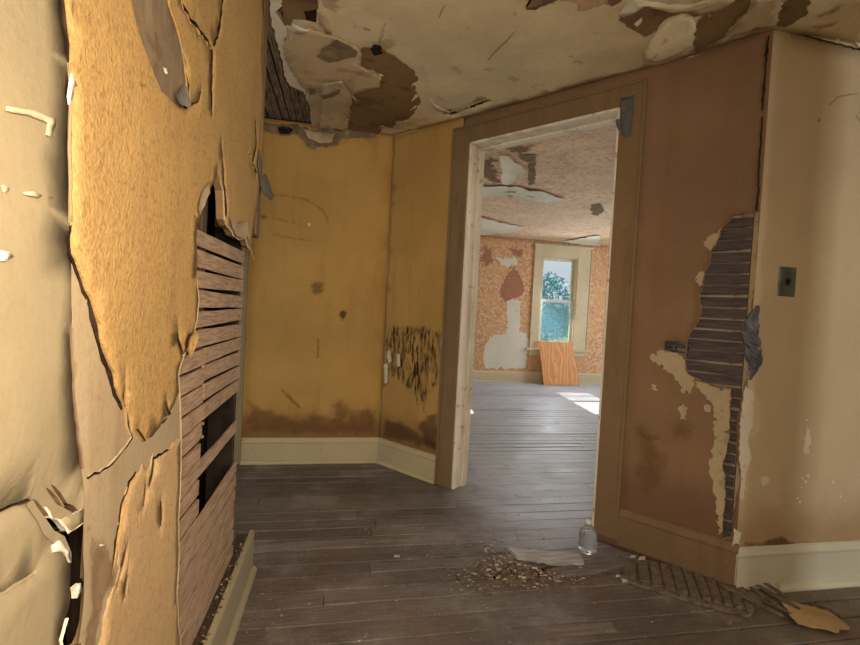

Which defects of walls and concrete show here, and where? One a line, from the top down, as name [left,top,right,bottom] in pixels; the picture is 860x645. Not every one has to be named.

peeling [67,73,77,105]
flaking render [132,0,186,107]
crack [181,0,224,116]
spalling [264,0,340,122]
spalling [618,0,735,26]
crack [803,35,860,51]
crack [59,0,168,598]
spalling [43,180,251,645]
leakage [385,416,437,448]
leakage [386,327,439,402]
flaking render [483,299,529,370]
spalling [650,212,756,546]